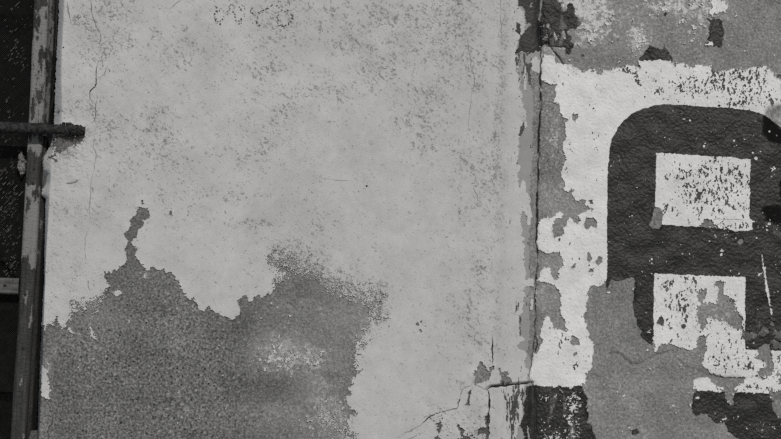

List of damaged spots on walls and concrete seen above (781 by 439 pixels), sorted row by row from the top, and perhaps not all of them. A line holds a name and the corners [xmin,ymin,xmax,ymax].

crack [66,4,108,257]
flaking render [37,200,392,439]
flaking render [430,413,490,439]
crack [404,30,564,439]
flaking render [465,361,512,406]
peeling [527,0,781,439]